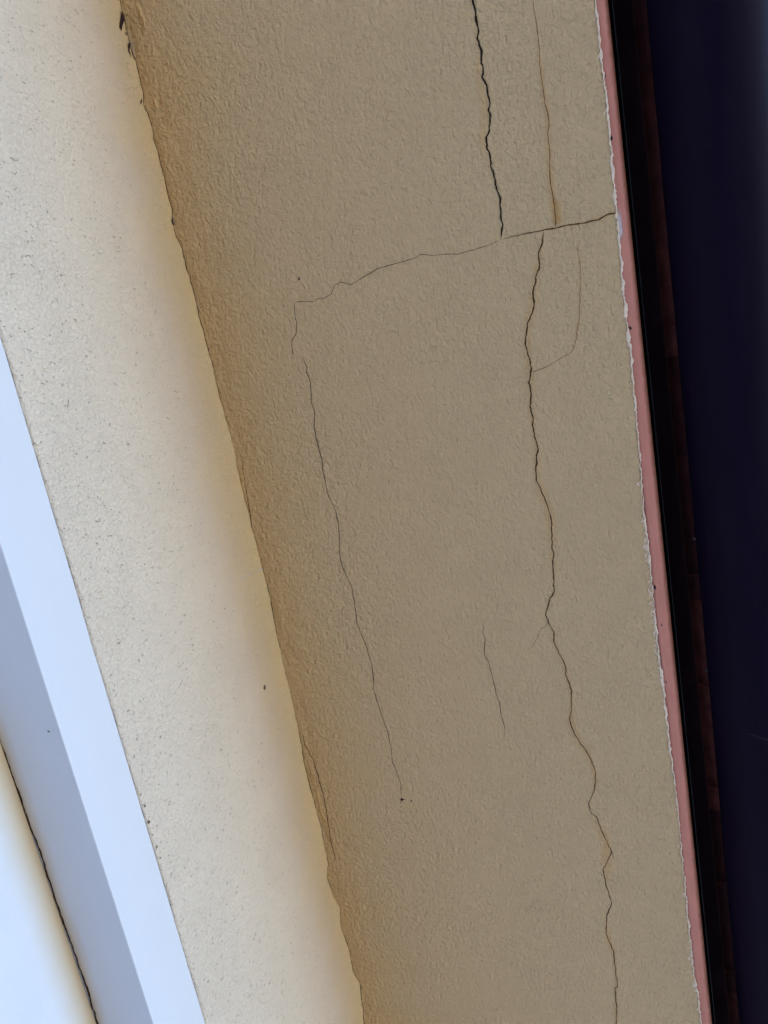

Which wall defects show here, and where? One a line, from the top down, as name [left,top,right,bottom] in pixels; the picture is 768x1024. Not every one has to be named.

crack [120,1,219,388]
crack [291,0,619,1024]